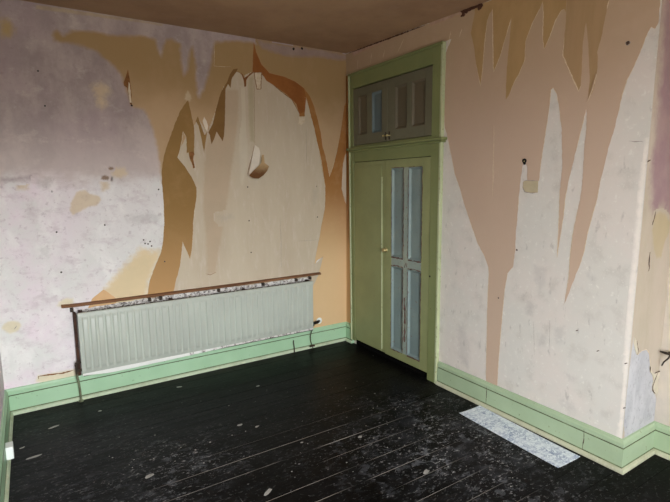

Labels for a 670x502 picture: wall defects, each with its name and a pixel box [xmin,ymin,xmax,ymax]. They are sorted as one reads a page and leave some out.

peeling [82,39,351,328]
peeling [460,0,609,99]